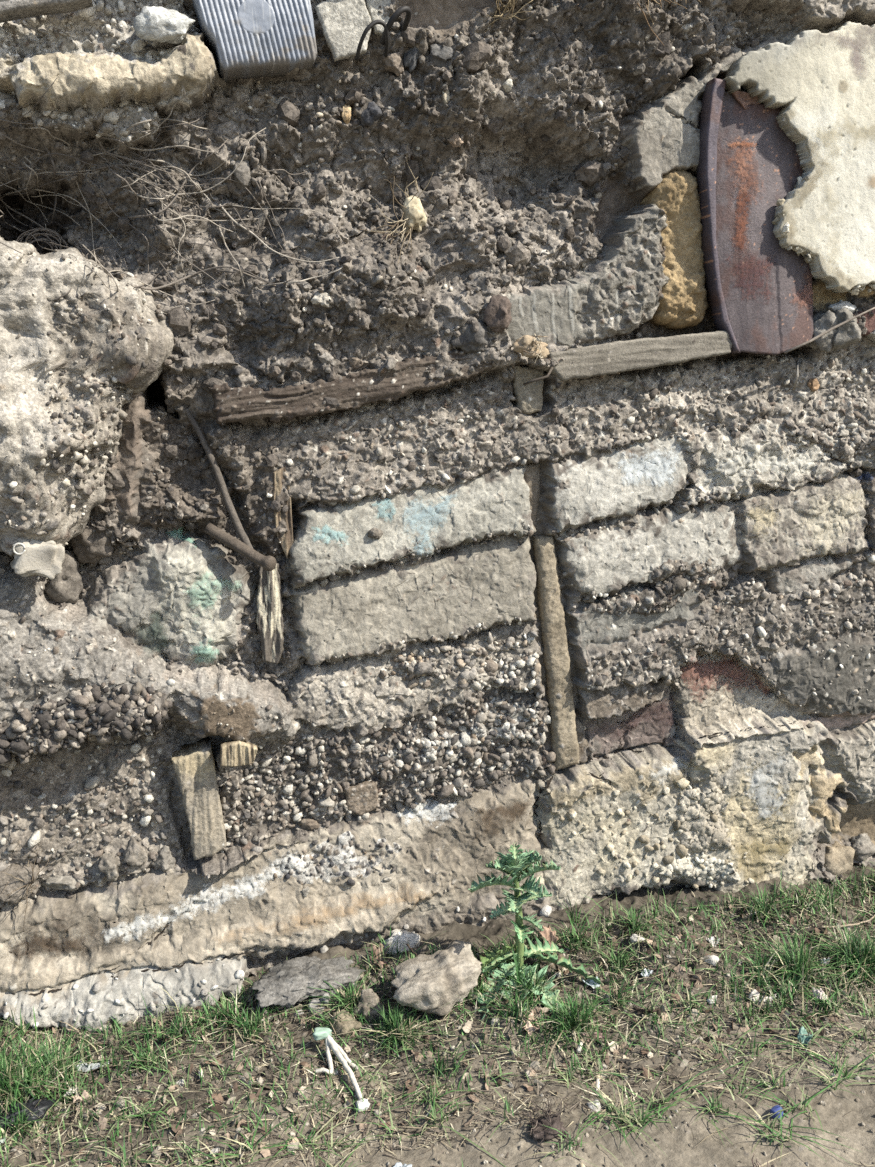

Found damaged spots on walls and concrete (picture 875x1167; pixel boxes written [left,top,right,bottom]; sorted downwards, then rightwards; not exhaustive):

rust [696,78,814,355]